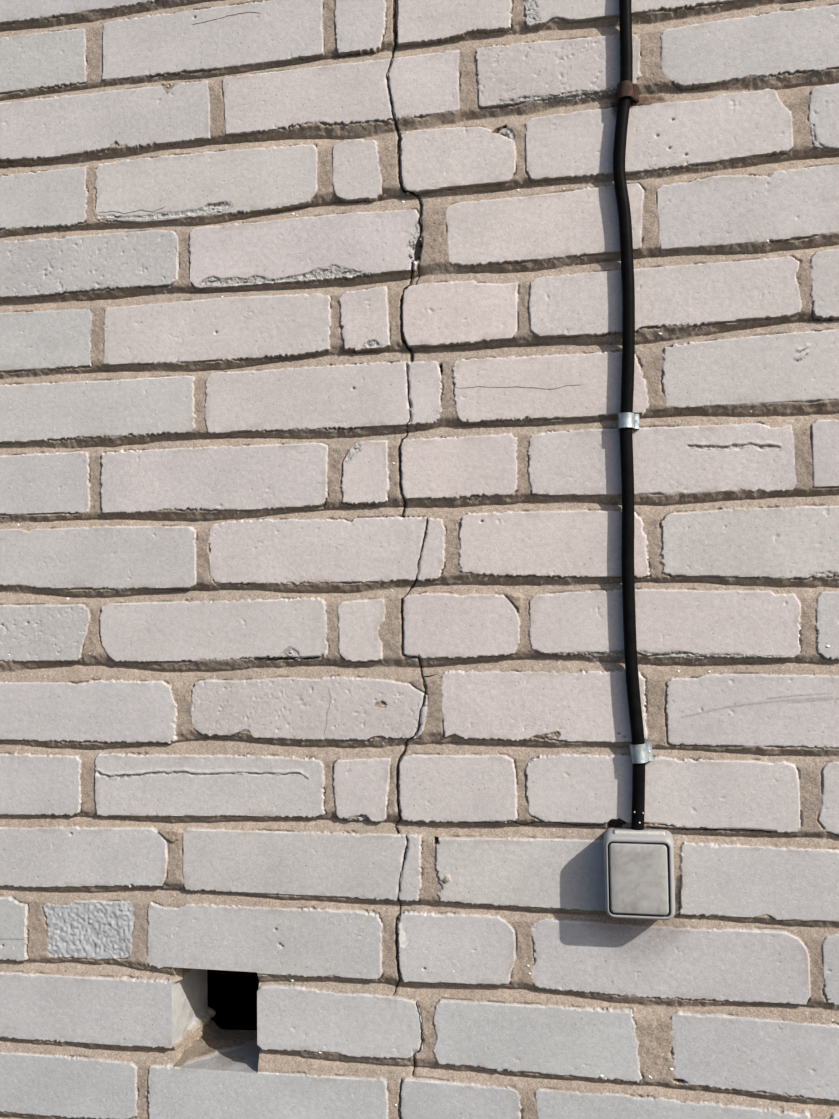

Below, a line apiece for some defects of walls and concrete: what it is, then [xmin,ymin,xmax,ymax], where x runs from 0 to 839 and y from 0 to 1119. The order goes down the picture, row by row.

spalling [97,202,233,220]
spalling [198,265,370,287]
crack [386,0,436,1119]